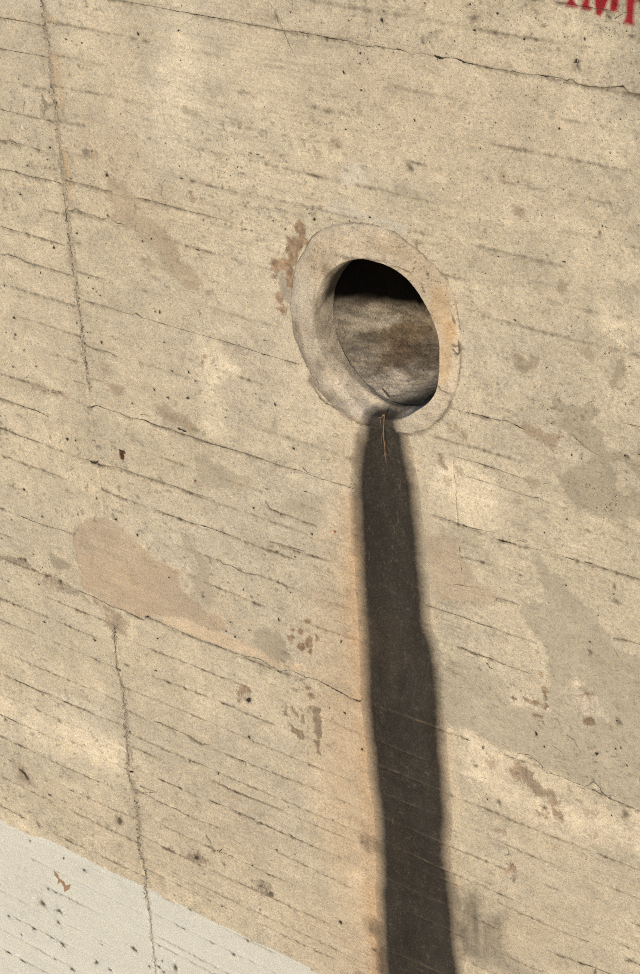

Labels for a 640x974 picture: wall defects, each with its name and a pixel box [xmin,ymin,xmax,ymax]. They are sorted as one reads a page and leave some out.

crack [106,0,640,102]
crack [0,0,362,490]
crack [402,339,524,438]
crack [85,459,215,502]
crack [0,507,75,534]
crack [167,514,261,578]
crack [268,542,304,553]
crack [265,501,317,530]
crack [5,669,86,708]
damp [289,373,640,974]